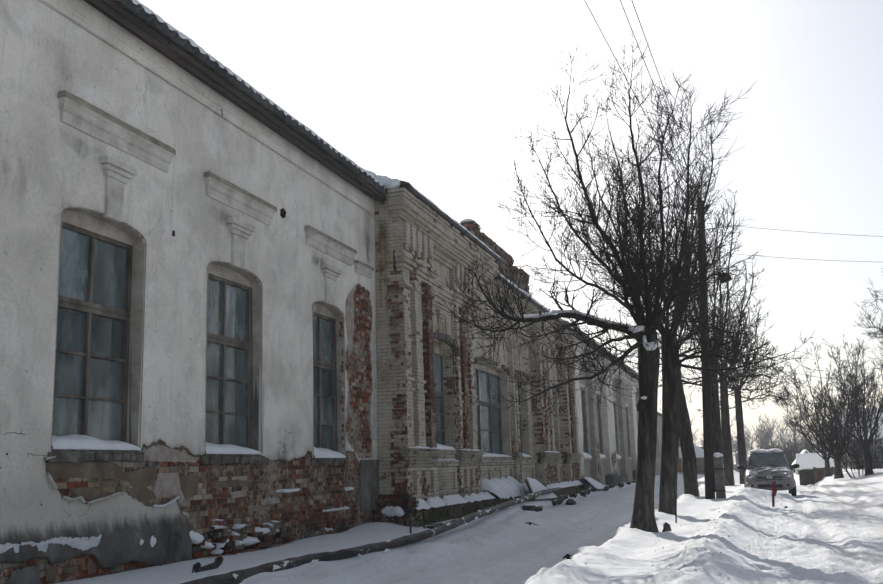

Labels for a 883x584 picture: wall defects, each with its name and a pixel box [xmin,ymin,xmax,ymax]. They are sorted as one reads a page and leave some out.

spalling [44,279,423,560]
spalling [0,554,157,584]